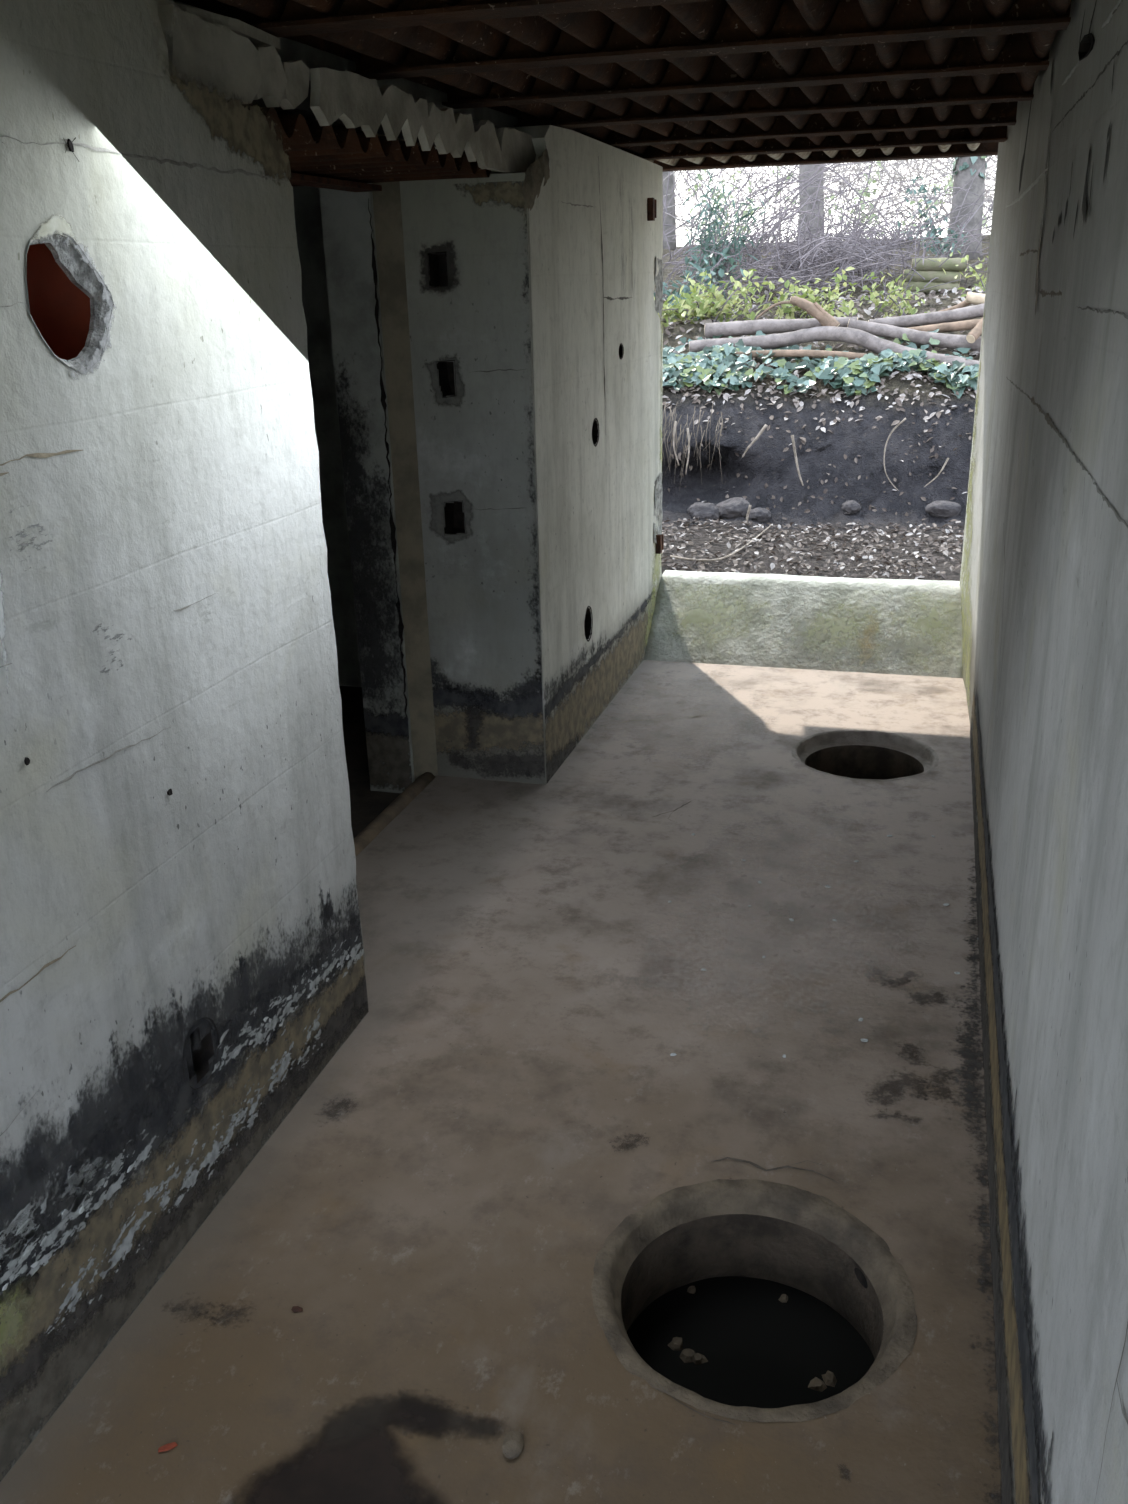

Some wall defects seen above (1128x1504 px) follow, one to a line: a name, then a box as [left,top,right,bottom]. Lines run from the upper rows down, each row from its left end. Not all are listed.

spalling [171,72,291,185]
spalling [455,148,550,217]
crack [1019,0,1128,257]
spalling [26,216,115,378]
crack [1039,289,1128,319]
crack [1006,377,1128,528]
water stain [430,529,661,783]
water stain [0,877,368,1410]
water stain [870,687,1053,1504]